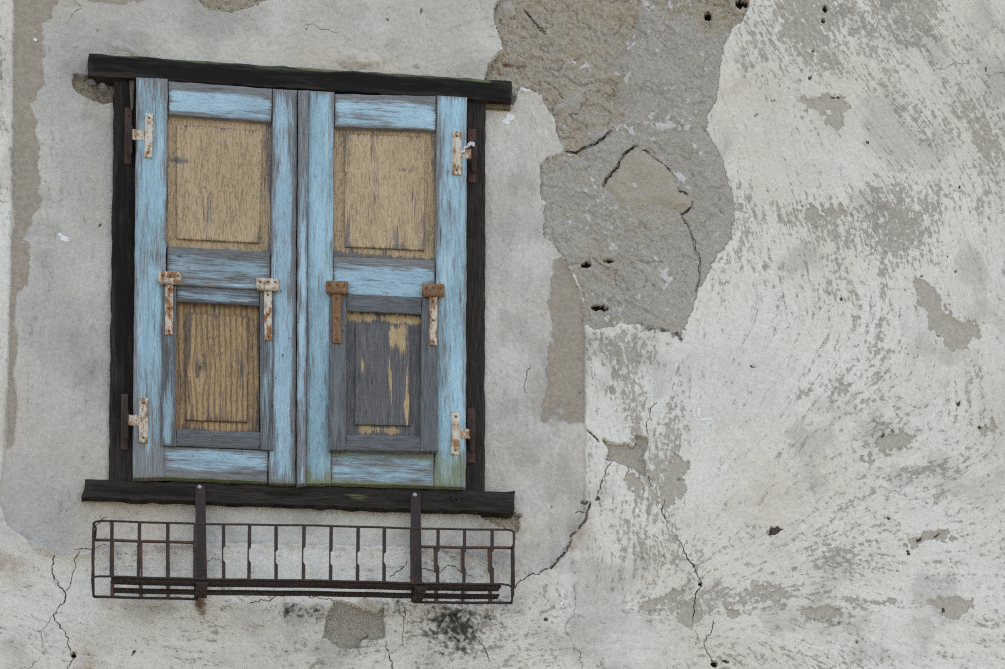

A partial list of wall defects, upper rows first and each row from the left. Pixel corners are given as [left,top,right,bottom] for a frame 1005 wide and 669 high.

flaking render [198,0,268,13]
peeling [799,93,851,137]
flaking render [485,0,749,337]
peeling [913,275,985,352]
crack [514,429,612,589]
crack [20,544,106,669]
flaking render [323,602,385,649]
damp [419,606,491,655]
crack [648,477,714,662]